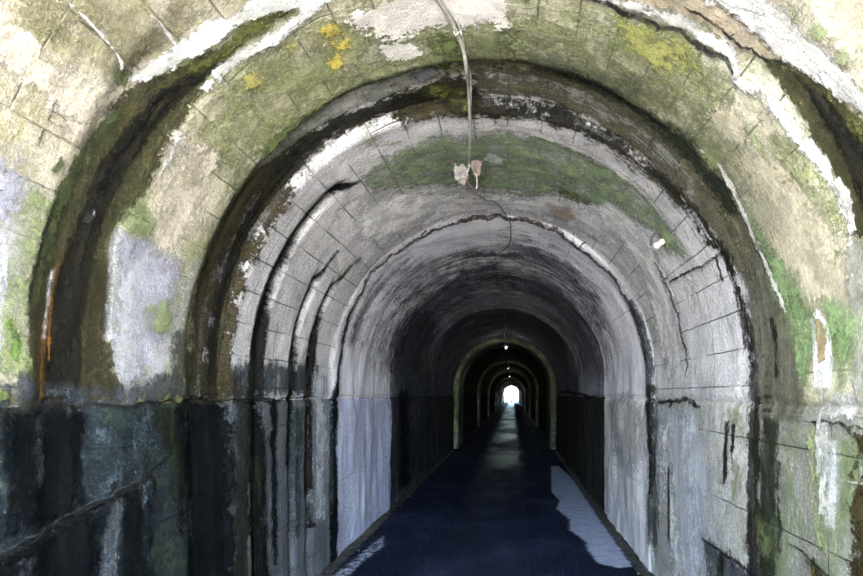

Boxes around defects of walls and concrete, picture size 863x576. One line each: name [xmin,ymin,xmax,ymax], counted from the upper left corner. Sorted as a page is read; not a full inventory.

peeling [344,0,513,62]
peeling [633,0,788,63]
crack [594,0,863,155]
corrosion [37,263,61,403]
leakage [0,0,476,576]
crack [342,213,646,375]
leakage [353,184,682,379]
leakage [469,11,805,576]
crack [657,396,700,408]
crack [655,251,734,375]
leakage [600,0,863,516]
crack [803,419,863,435]